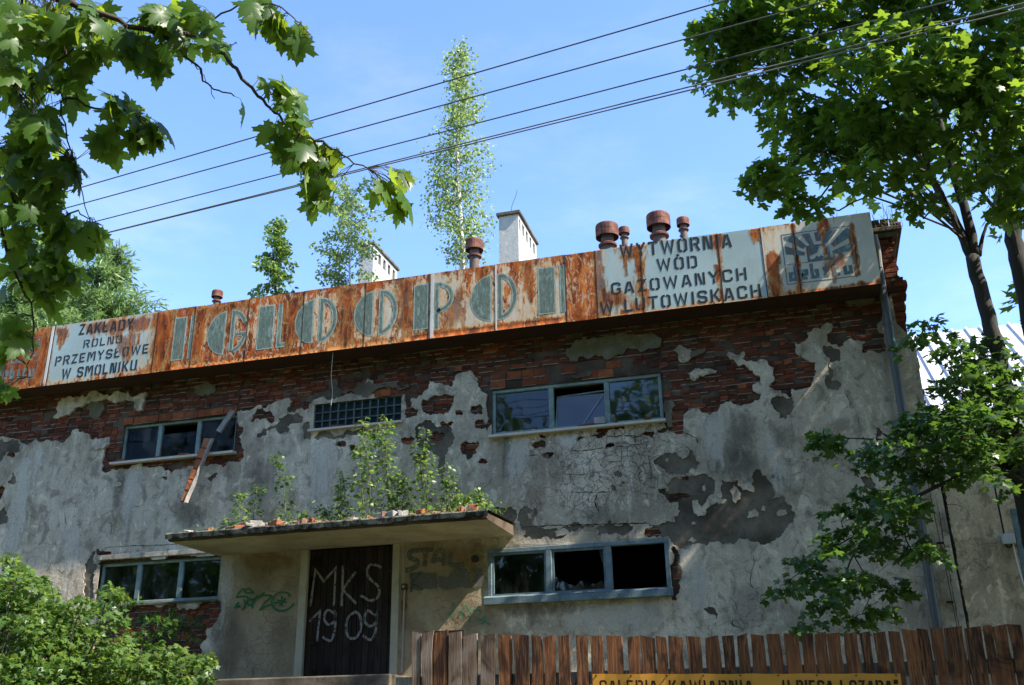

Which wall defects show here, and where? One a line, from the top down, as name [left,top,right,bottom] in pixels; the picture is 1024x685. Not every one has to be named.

rust [2,326,69,388]
rust [86,278,569,373]
flaking render [0,218,906,482]
rust [475,266,490,280]
rust [520,260,534,303]
rust [592,218,881,318]
crack [528,431,653,527]
flaking render [494,447,795,601]
flaking render [94,602,222,683]